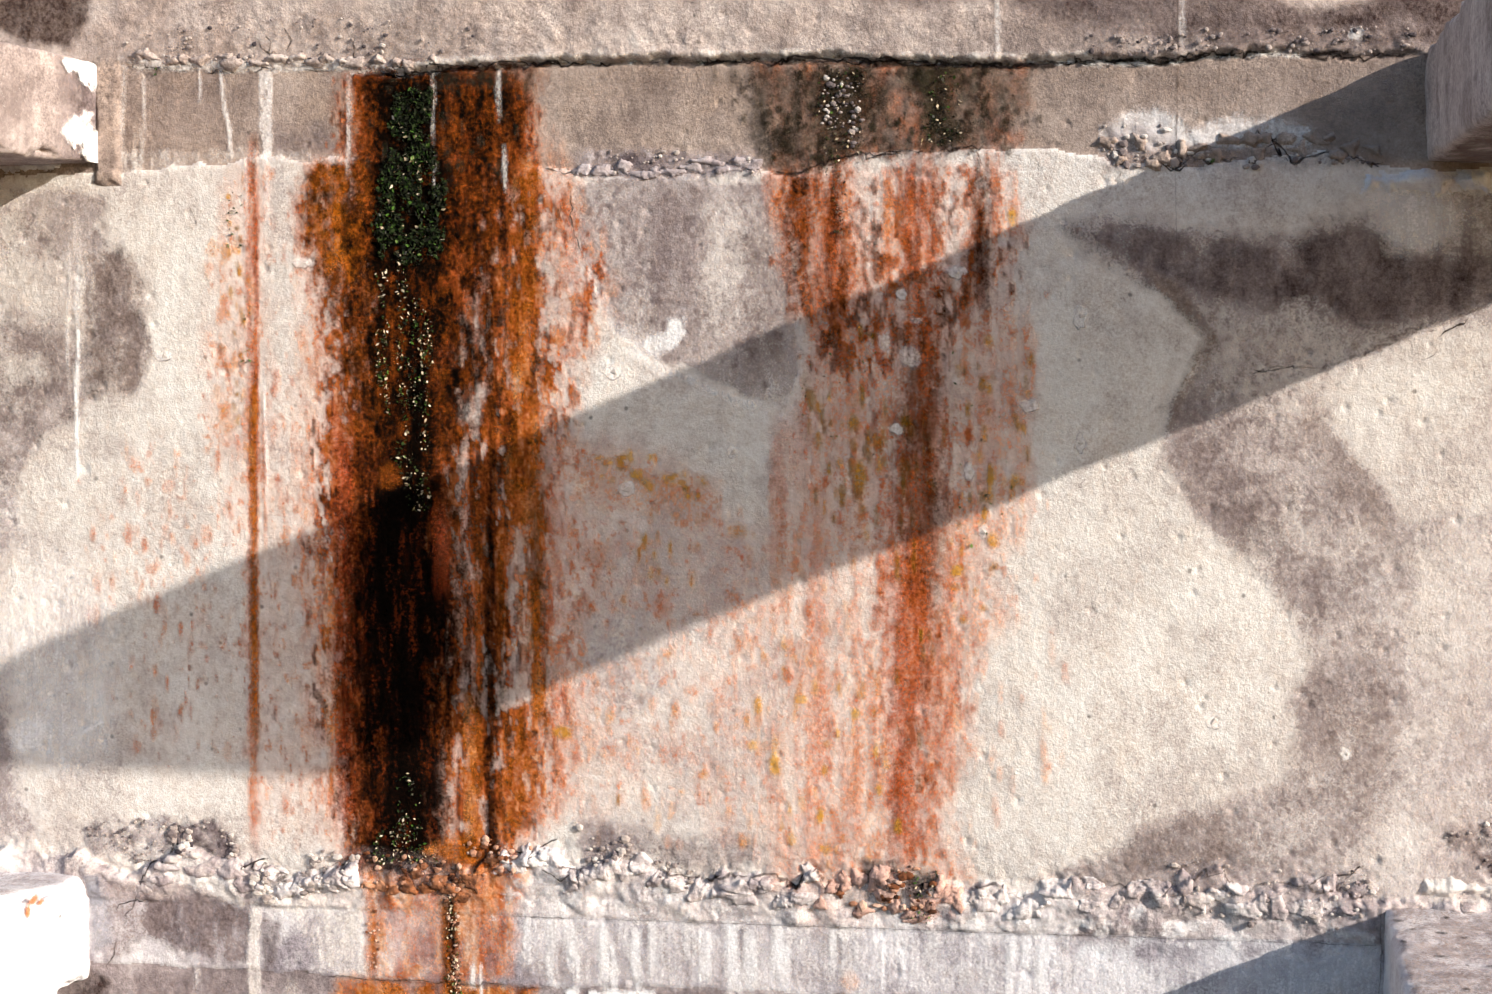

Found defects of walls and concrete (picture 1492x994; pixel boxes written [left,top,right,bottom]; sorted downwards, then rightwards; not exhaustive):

spalling [1095,124,1383,171]
leakage [0,188,153,555]
leakage [570,161,799,400]
leakage [0,667,104,836]
rust [154,595,216,722]
rust [204,63,745,994]
leakage [585,820,758,871]
spalling [86,815,1379,988]
rust [726,104,1035,879]
leakage [1026,193,1492,994]